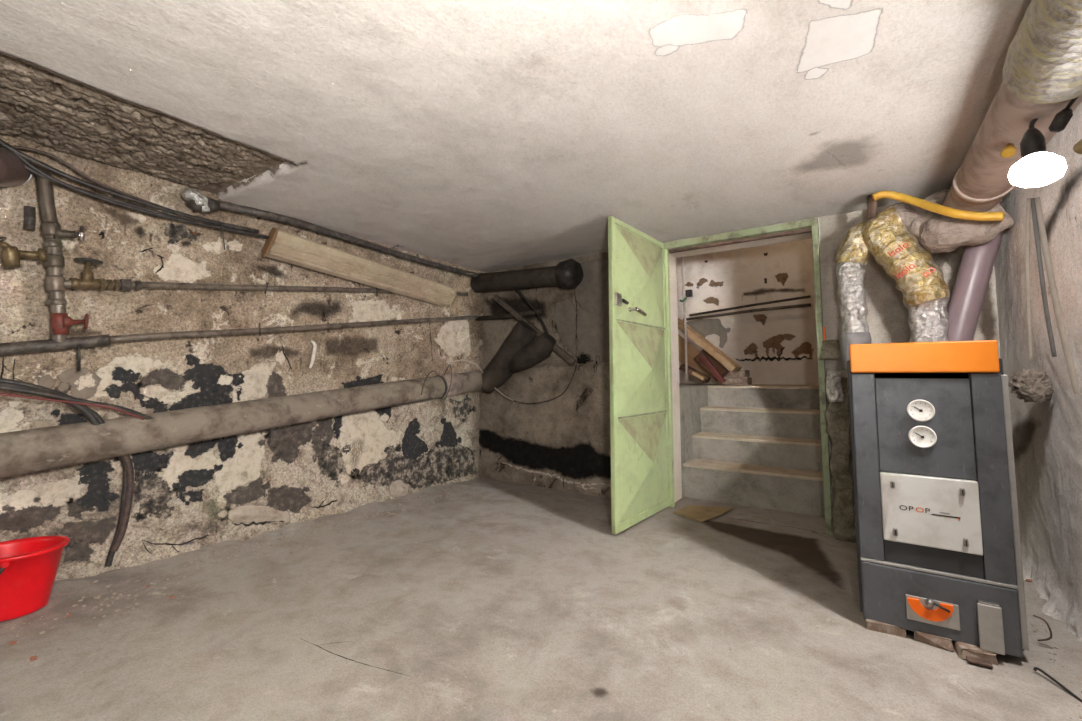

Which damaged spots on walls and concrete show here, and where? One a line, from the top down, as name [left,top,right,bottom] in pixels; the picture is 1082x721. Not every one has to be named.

spalling [0,52,293,196]
peeling [128,211,146,223]
peeling [152,233,243,283]
peeling [349,299,402,323]
peeling [435,316,471,365]
peeling [54,354,201,408]
peeling [217,350,286,403]
peeling [0,397,25,433]
peeling [133,410,420,522]
peeling [0,474,120,563]